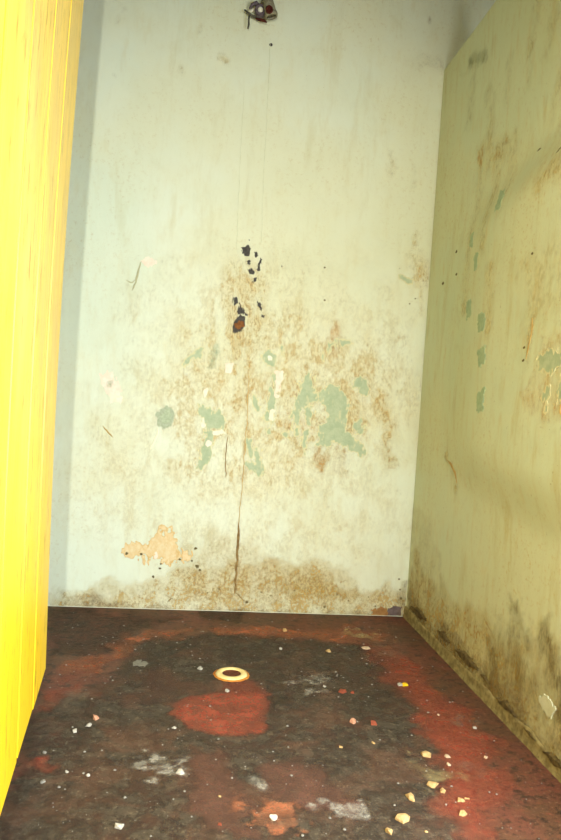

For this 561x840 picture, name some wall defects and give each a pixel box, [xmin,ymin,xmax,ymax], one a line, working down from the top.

flaking render [241,240,262,282]
flaking render [232,297,265,333]
flaking render [150,405,175,450]
peeling [195,388,227,472]
peeling [244,437,265,477]
peeling [249,344,285,435]
peeling [281,372,371,458]
peeling [536,347,561,415]
peeling [121,524,201,578]
water stain [378,571,536,725]
water stain [0,565,475,840]